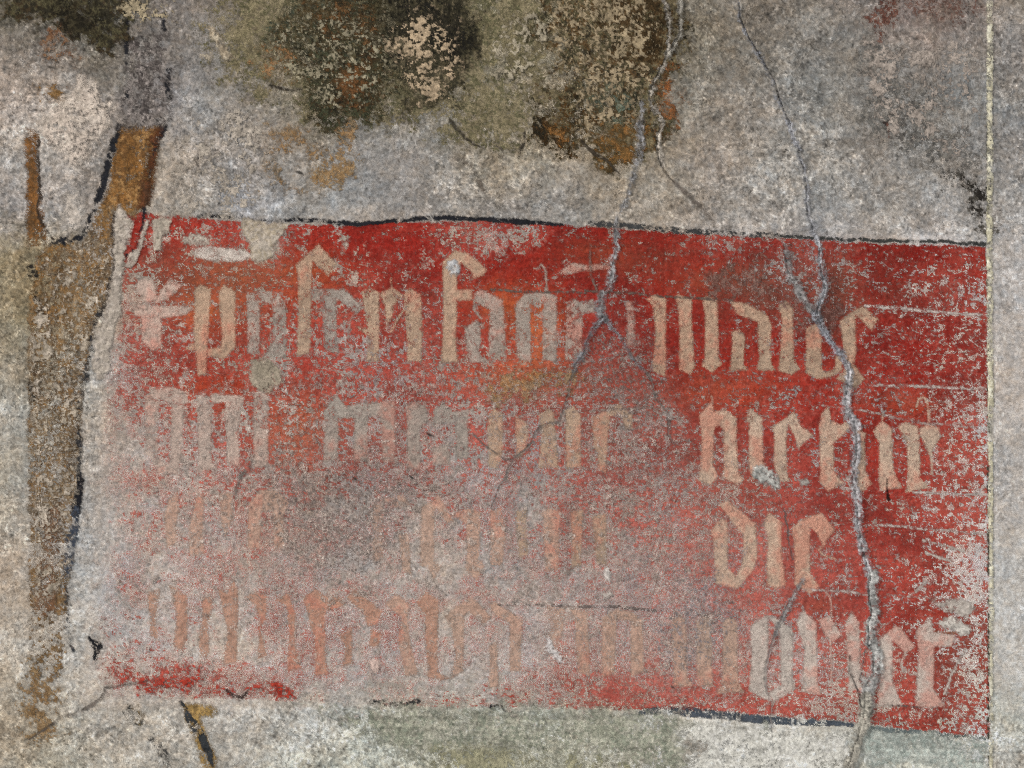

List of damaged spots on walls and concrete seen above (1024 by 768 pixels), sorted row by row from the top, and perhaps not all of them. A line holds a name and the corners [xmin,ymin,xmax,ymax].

damp [260,0,486,134]
crack [474,0,711,509]
damp [527,0,695,180]
crack [738,8,890,768]